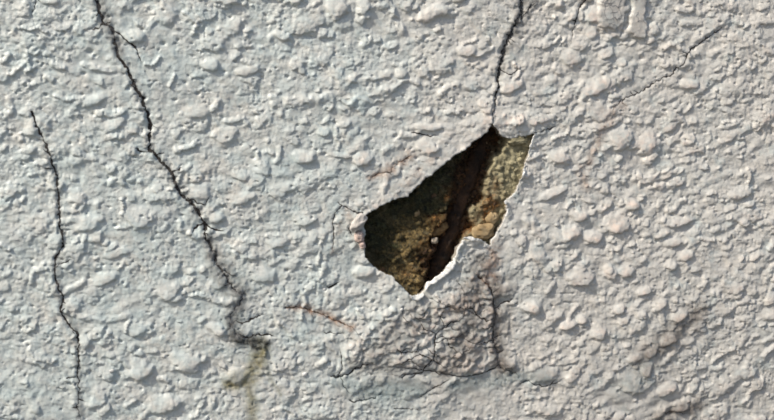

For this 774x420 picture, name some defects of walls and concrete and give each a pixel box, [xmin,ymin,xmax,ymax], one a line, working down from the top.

crack [492,0,537,120]
crack [607,27,722,118]
crack [30,111,85,419]
crack [92,0,273,345]
crack [332,202,363,252]
spalling [350,126,535,301]
damp [225,333,269,388]
crack [285,306,382,403]
crack [390,276,560,411]